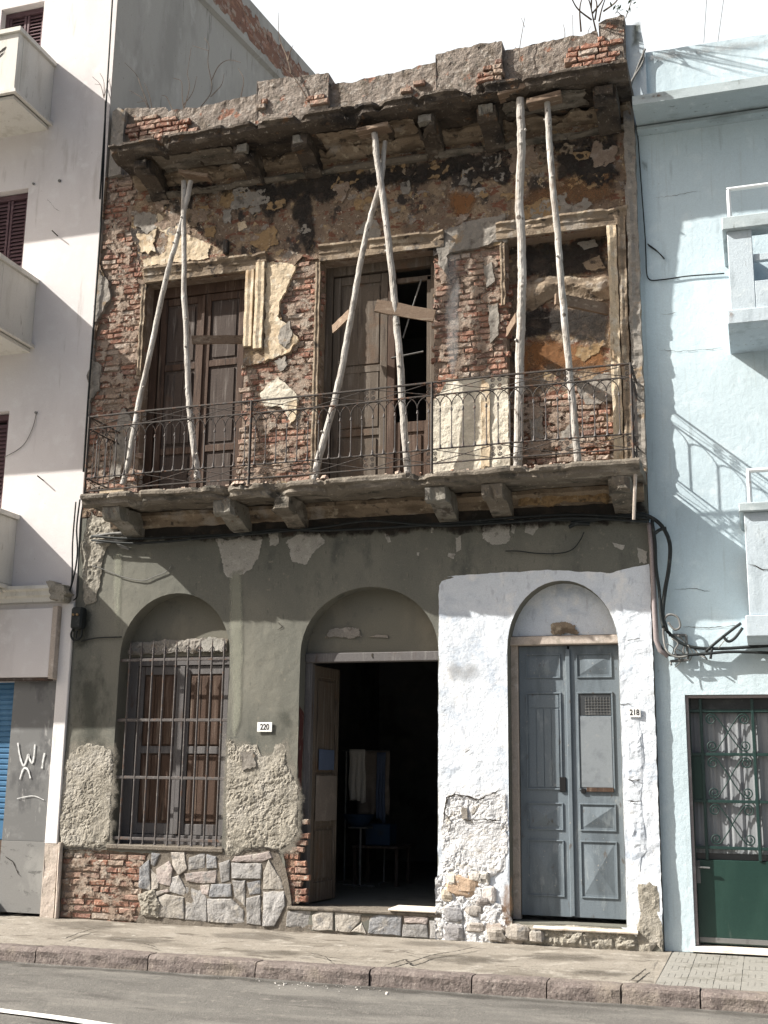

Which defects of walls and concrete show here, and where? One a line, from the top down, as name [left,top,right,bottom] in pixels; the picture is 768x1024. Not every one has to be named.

flaking render [125,114,200,142]
leakage [255,184,279,224]
flaking render [86,173,326,494]
flaking render [391,140,618,473]
spalling [46,512,118,606]
peeling [215,533,325,578]
spalling [482,485,609,545]
spalling [551,622,579,636]
spalling [59,742,161,922]
spalling [223,707,311,906]
spalling [440,790,509,877]
spalling [636,882,663,952]